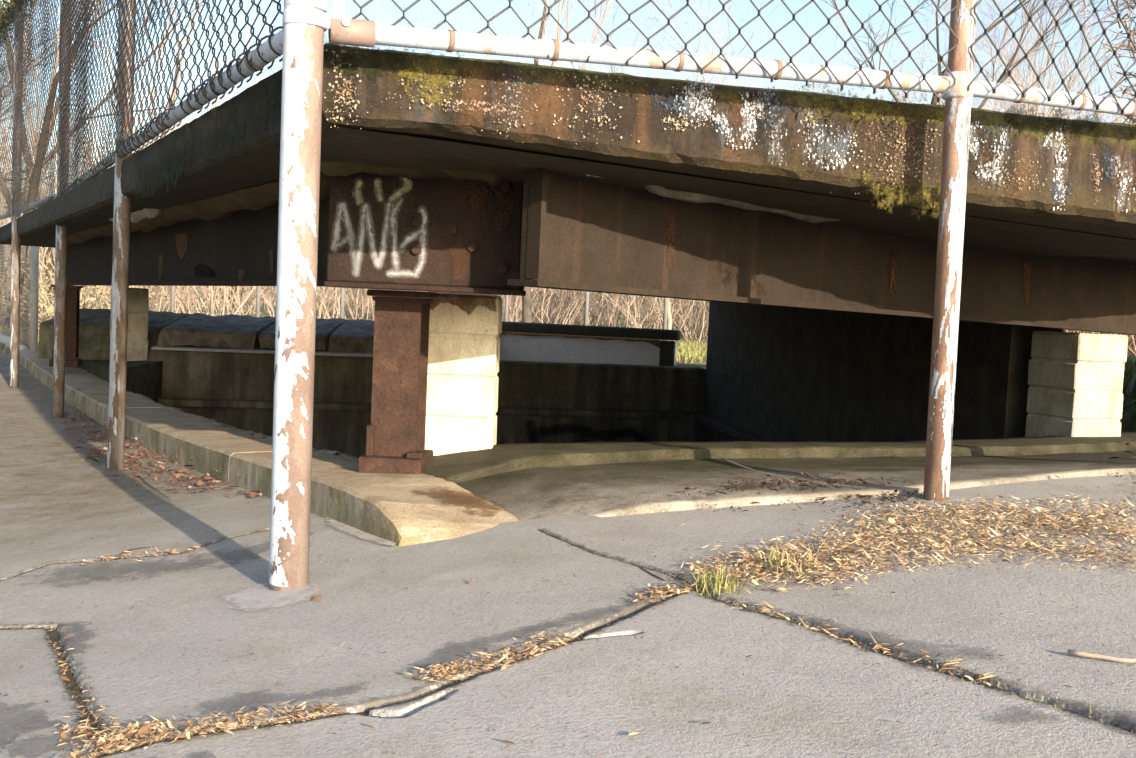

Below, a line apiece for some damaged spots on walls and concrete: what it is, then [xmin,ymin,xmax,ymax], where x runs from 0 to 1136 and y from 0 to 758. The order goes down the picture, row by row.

water stain [324,49,539,143]
water stain [546,66,647,144]
peeling [47,0,505,587]
crack [1,531,257,581]
crack [0,624,146,757]
crack [208,530,1135,735]